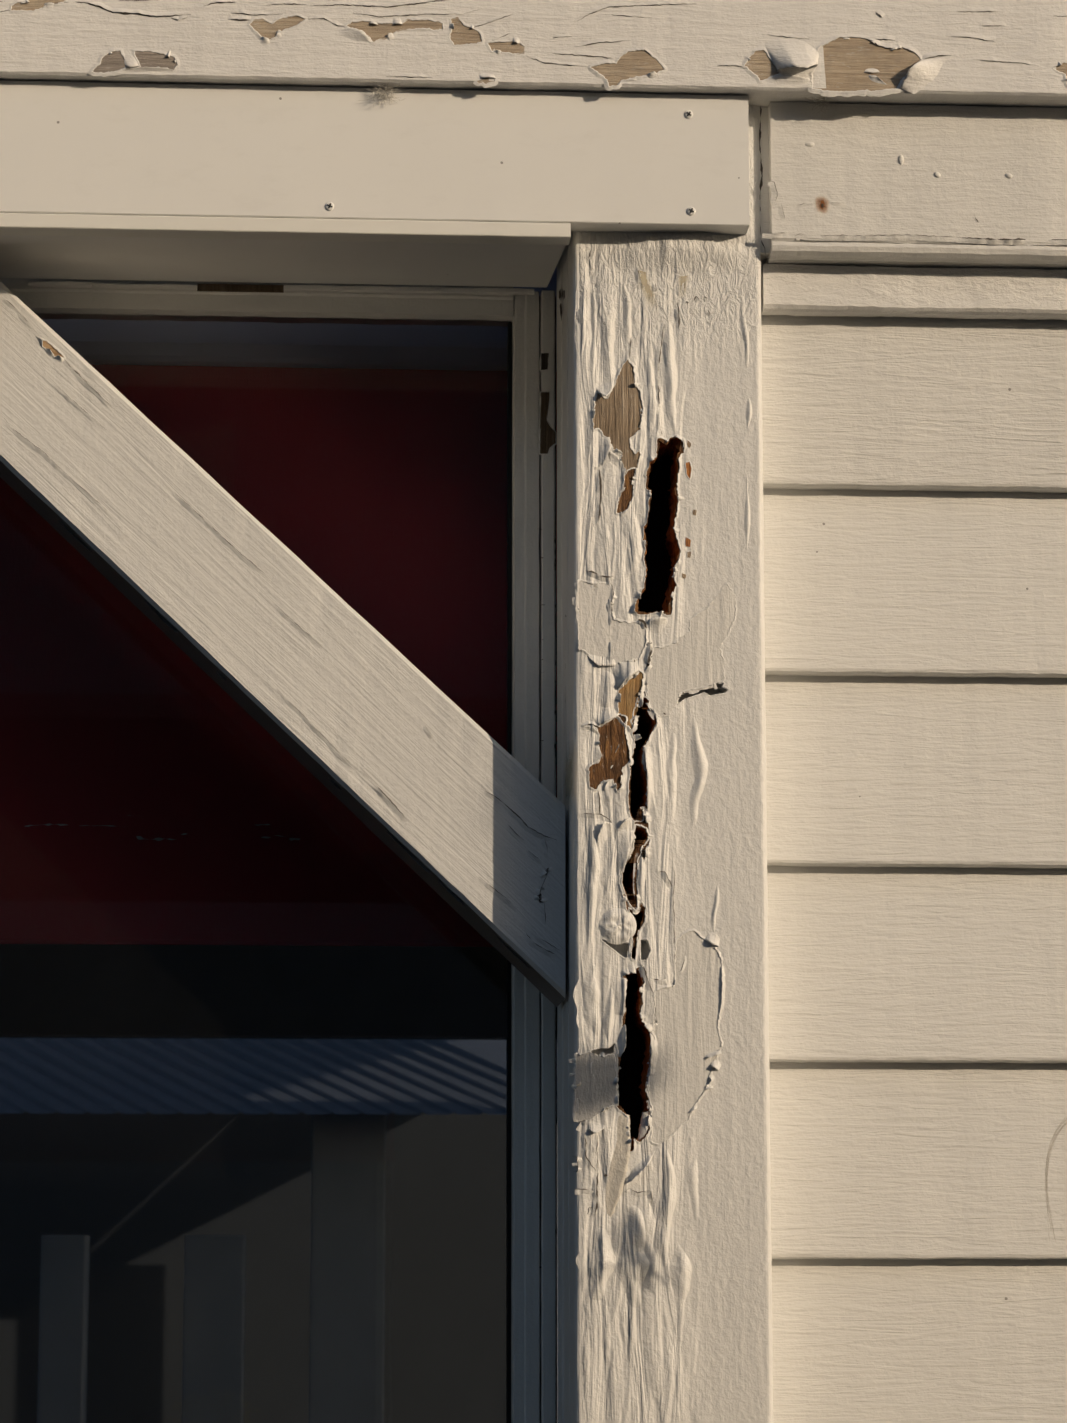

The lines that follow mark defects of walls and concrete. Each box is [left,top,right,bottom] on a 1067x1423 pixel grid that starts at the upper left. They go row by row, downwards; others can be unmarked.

peeling [8,0,66,14]
peeling [246,13,308,45]
peeling [339,15,525,56]
peeling [87,47,181,77]
peeling [473,73,498,88]
peeling [587,47,668,91]
peeling [741,33,946,97]
peeling [1052,60,1067,88]
peeling [569,358,738,1217]